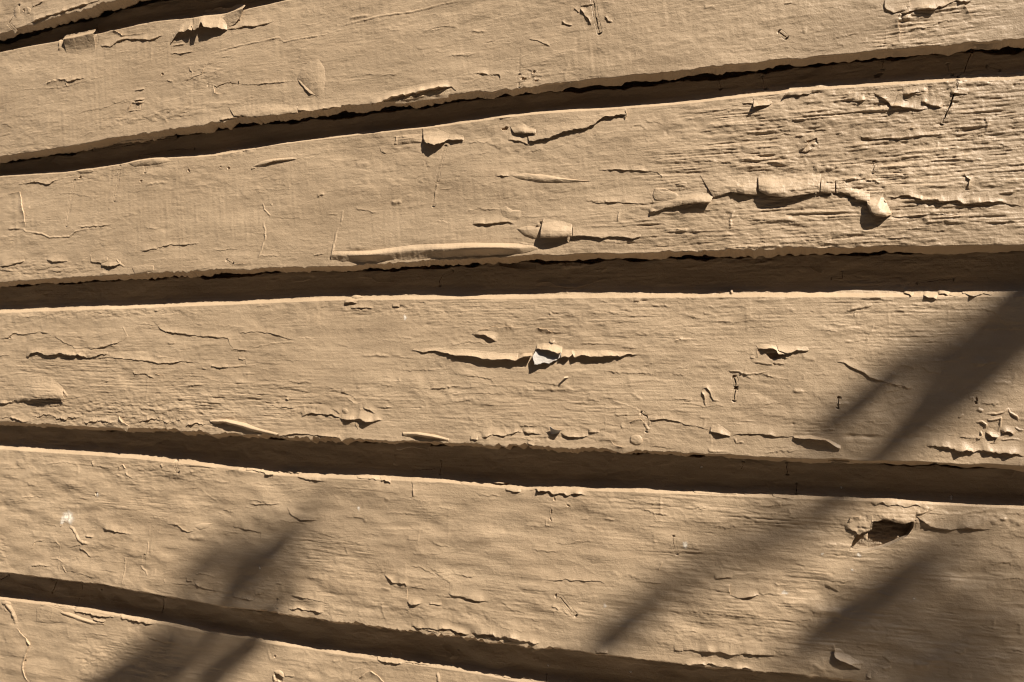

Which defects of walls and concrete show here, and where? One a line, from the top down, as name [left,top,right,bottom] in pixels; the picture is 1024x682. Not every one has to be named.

peeling [170,4,245,43]
peeling [379,128,464,154]
peeling [651,173,892,217]
peeling [518,219,641,239]
peeling [413,342,648,365]
peeling [753,344,809,362]
peeling [0,374,340,438]
peeling [340,386,383,431]
peeling [926,394,1024,457]
peeling [843,496,990,552]